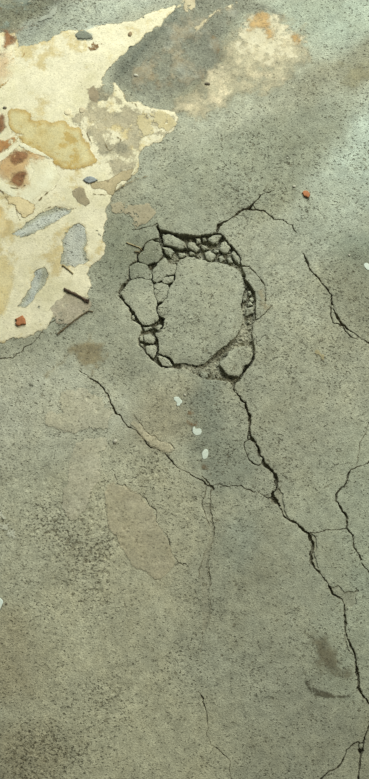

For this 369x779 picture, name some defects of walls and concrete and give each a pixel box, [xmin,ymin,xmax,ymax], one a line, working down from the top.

peeling [0,0,311,384]
crack [216,190,297,233]
crack [300,253,369,344]
crack [78,370,369,705]
crack [197,691,232,779]
crack [320,725,369,779]